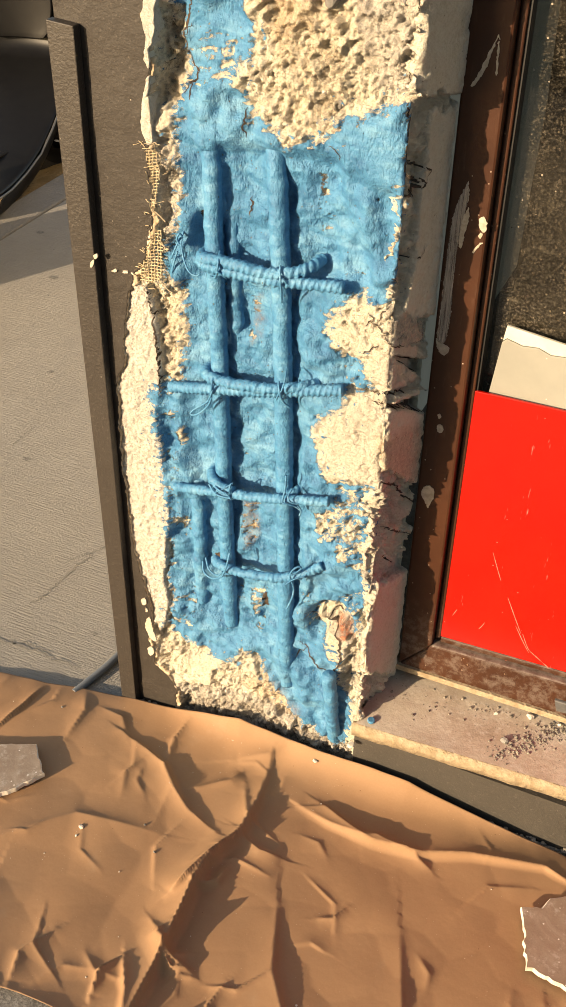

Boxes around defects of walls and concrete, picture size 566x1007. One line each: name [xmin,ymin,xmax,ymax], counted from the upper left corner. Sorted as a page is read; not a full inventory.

spalling [117,0,451,761]
crack [296,605,345,672]